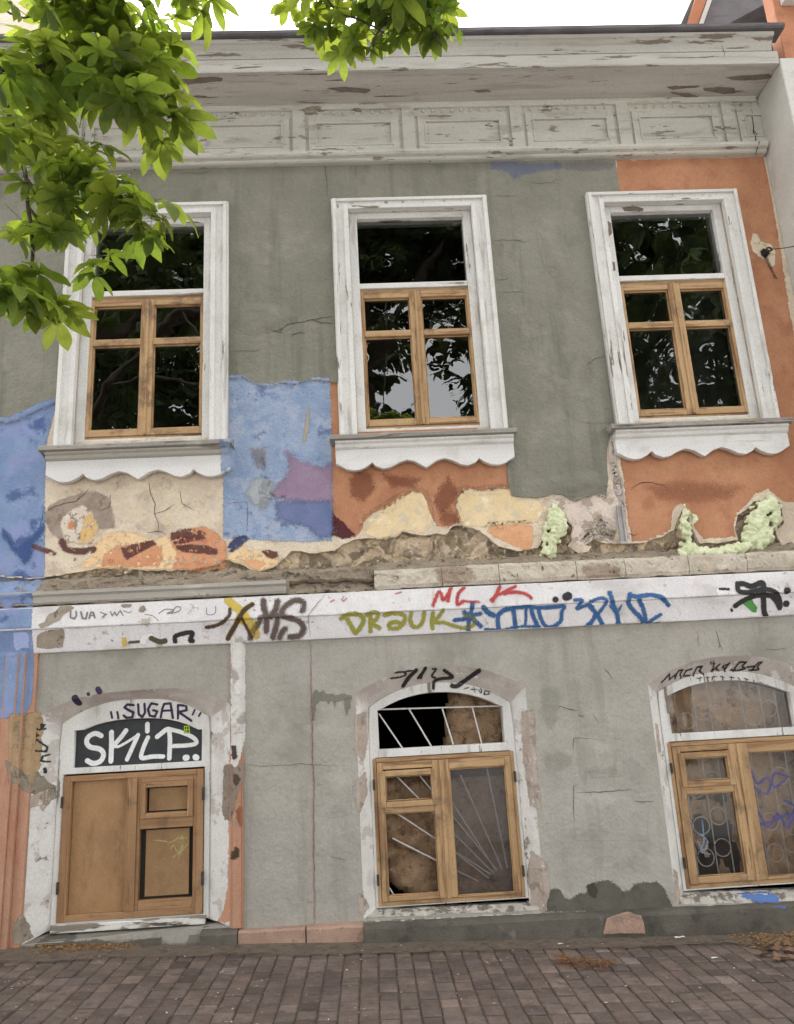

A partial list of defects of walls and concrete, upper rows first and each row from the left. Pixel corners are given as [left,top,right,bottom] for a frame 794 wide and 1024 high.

peeling [668,74,772,97]
spalling [750,233,777,279]
crack [272,316,332,335]
crack [149,485,193,534]
peeling [362,490,433,540]
peeling [455,436,631,551]
peeling [227,545,279,571]
peeling [6,712,57,811]
peeling [218,642,246,923]
peeling [354,712,368,812]
peeling [521,709,542,809]
damp [546,879,673,913]